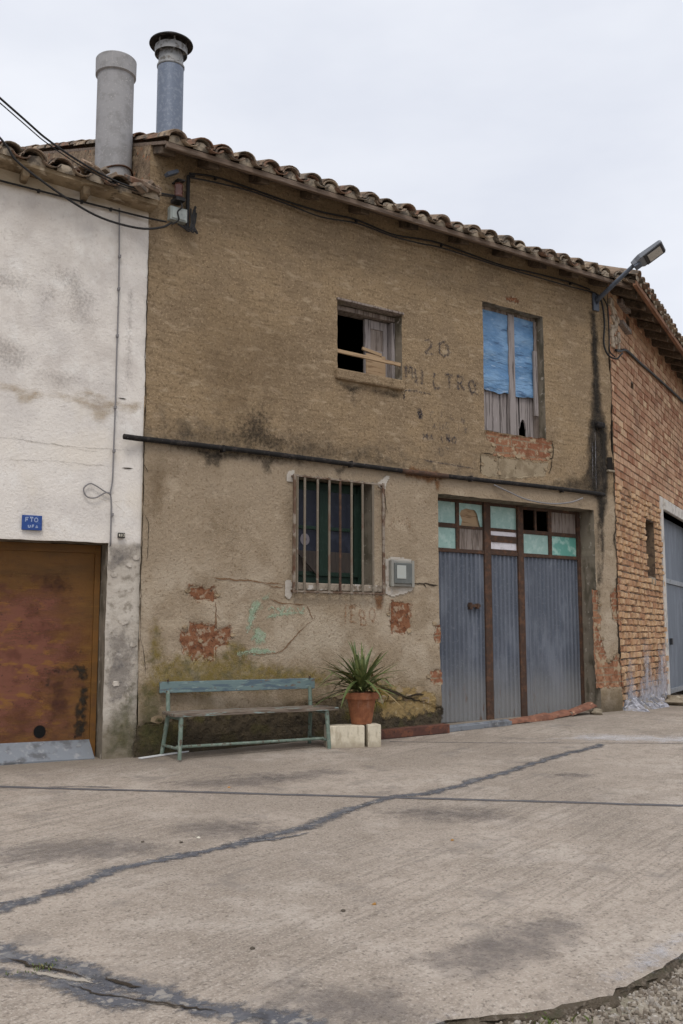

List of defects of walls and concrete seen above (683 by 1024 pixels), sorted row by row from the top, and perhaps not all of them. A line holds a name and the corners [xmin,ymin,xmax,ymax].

flaking render [480,431,553,479]
water stain [569,313,607,552]
corrosion [0,583,88,741]
flaking render [184,585,221,602]
flaking render [179,621,236,664]
flaking render [385,557,414,635]
flaking render [592,581,624,689]
crack [0,741,683,913]
crack [0,944,327,1024]